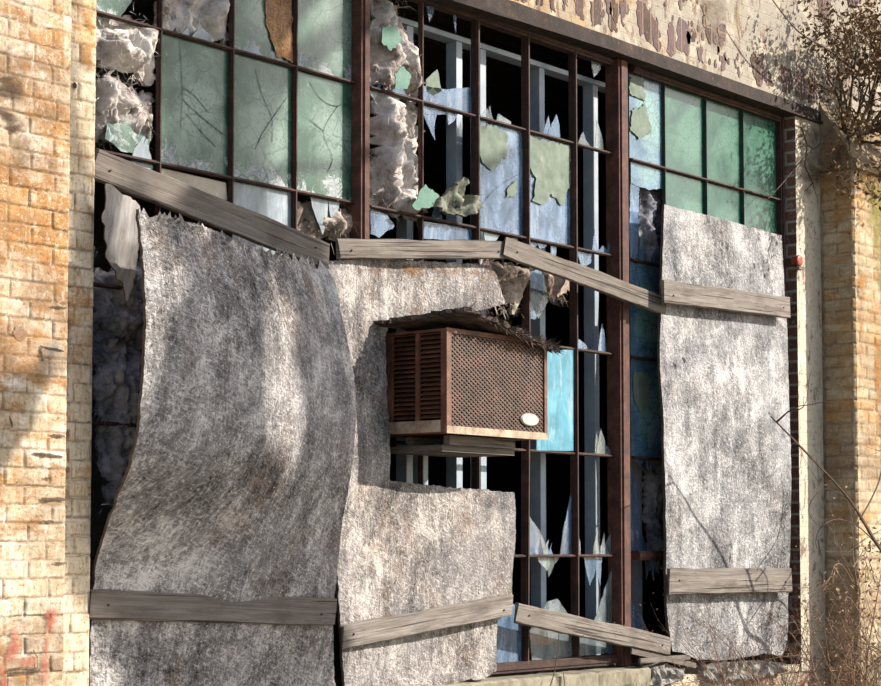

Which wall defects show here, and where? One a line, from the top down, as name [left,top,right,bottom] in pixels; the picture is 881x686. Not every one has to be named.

peeling [518,0,741,78]
damp [0,109,19,132]
damp [0,77,22,98]
peeling [629,75,652,139]
peeling [750,53,817,103]